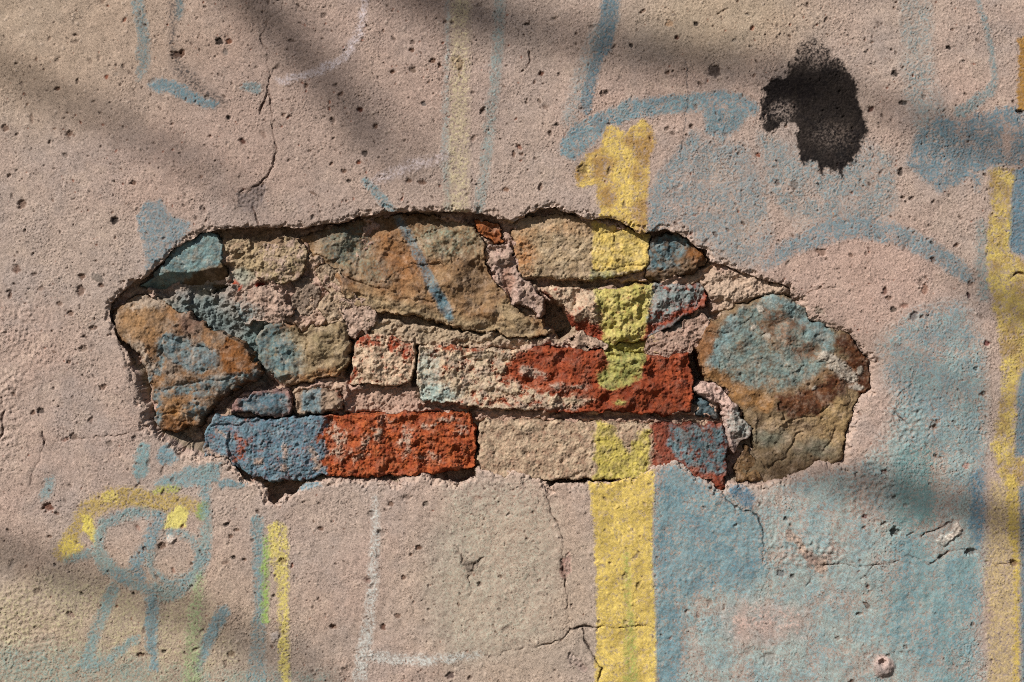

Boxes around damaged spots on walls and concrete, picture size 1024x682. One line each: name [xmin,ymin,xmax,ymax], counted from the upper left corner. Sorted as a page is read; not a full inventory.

crack [238,0,284,228]
spalling [109,207,871,505]
crack [490,487,655,682]